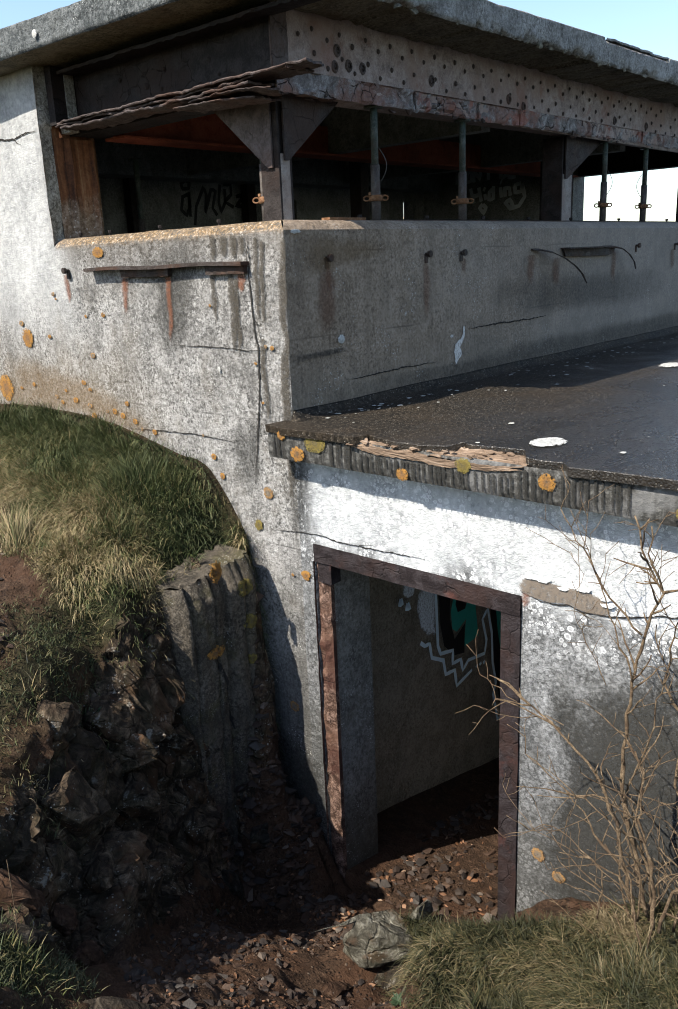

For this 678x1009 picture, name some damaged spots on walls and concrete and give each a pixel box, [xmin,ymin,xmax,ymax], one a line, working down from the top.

crack [0,131,34,144]
leakage [228,275,242,348]
leakage [210,236,265,322]
crack [180,235,267,484]
leakage [260,339,269,419]
crack [130,428,232,442]
spalling [346,438,528,471]
leakage [328,441,631,516]
crack [280,530,425,560]
peeling [520,573,616,615]
leakage [547,663,678,904]